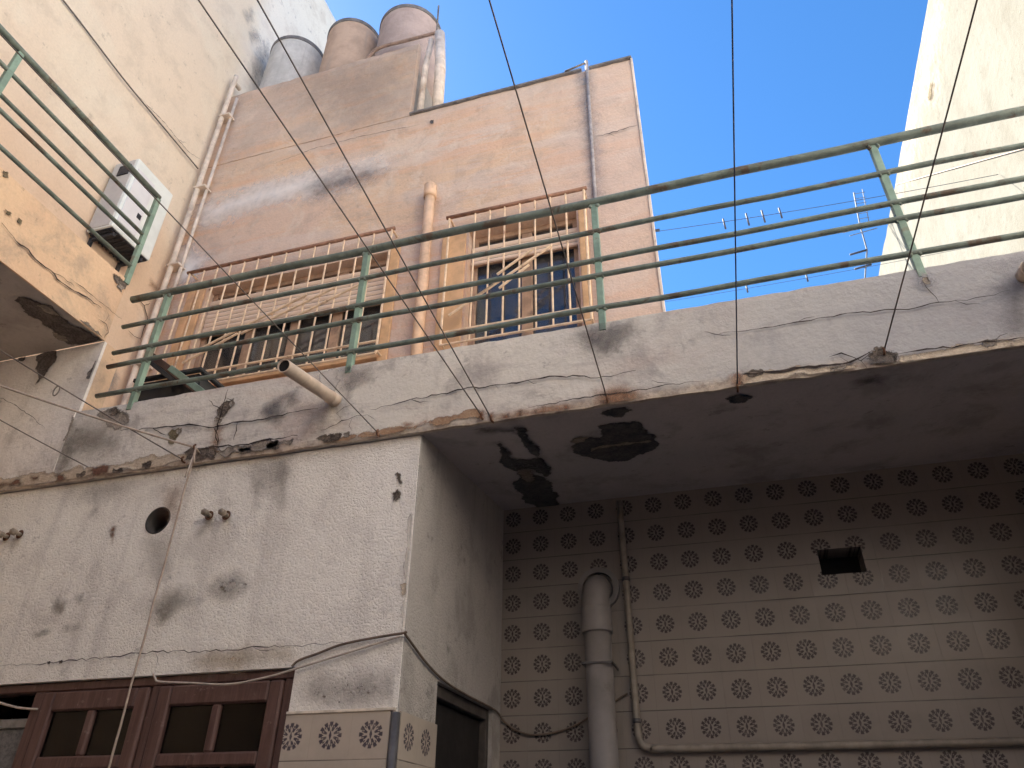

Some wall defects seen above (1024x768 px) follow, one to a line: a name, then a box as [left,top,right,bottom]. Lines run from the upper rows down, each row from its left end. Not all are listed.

crack [2,223,150,339]
crack [705,275,1008,336]
spalling [15,297,102,383]
crack [746,333,1024,375]
spalling [168,428,182,444]
spalling [214,399,235,423]
spalling [185,439,293,461]
crack [121,370,701,451]
spalling [318,408,559,507]
spalling [571,406,659,462]
crack [4,642,343,669]